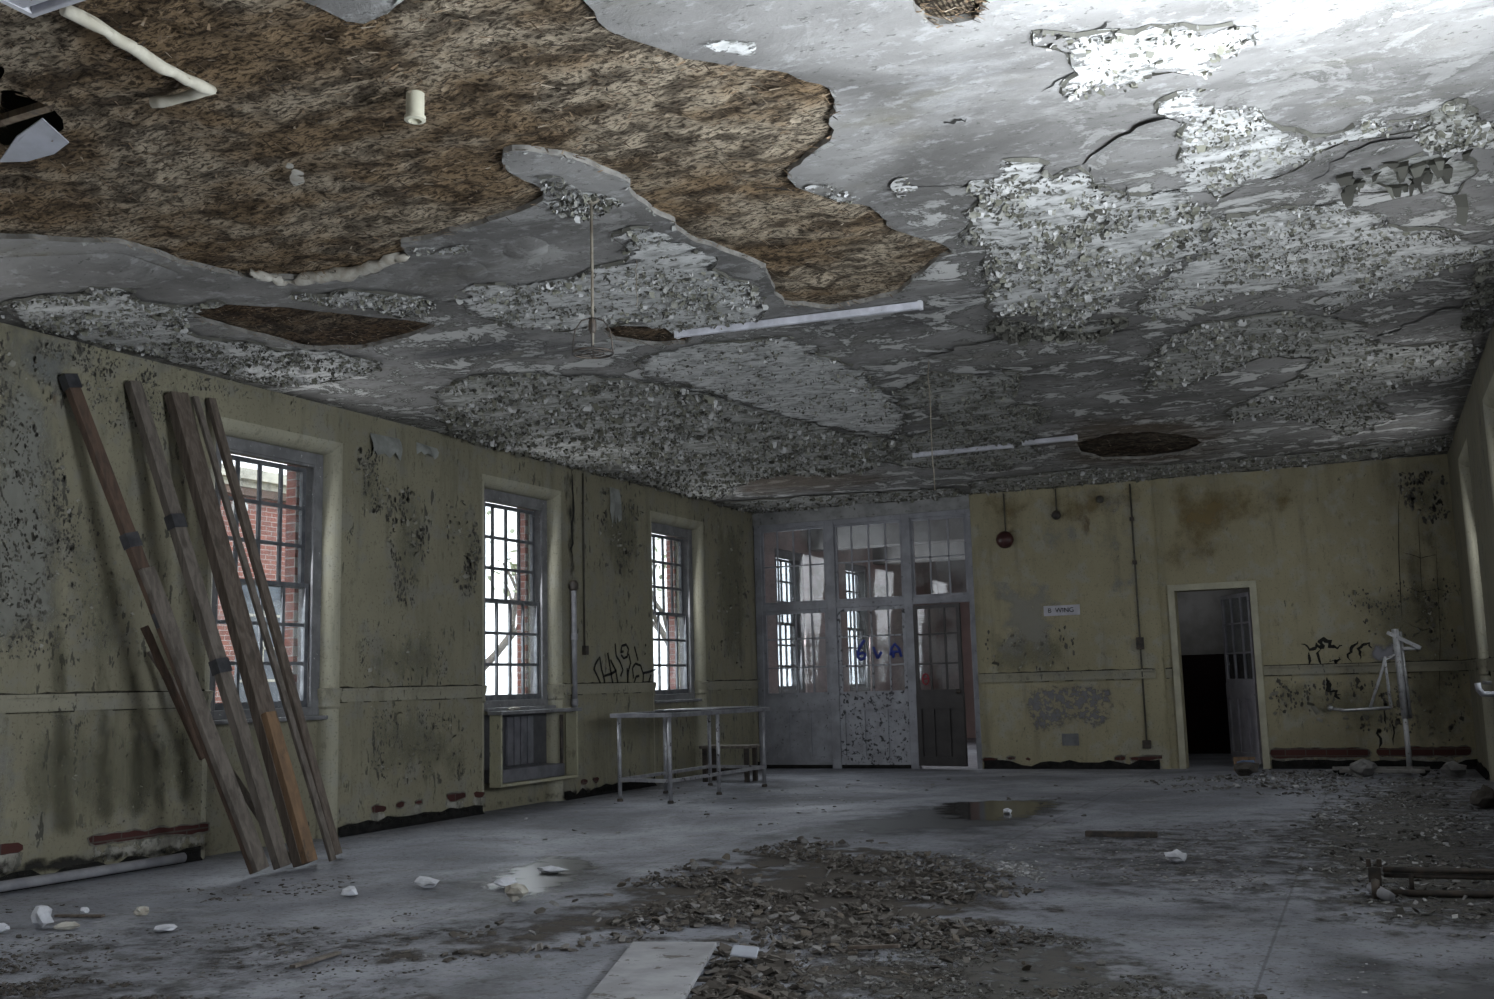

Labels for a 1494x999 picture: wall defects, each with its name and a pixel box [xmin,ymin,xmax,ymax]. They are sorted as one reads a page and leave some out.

flaking render [0,0,1494,660]
crack [1043,22,1107,91]